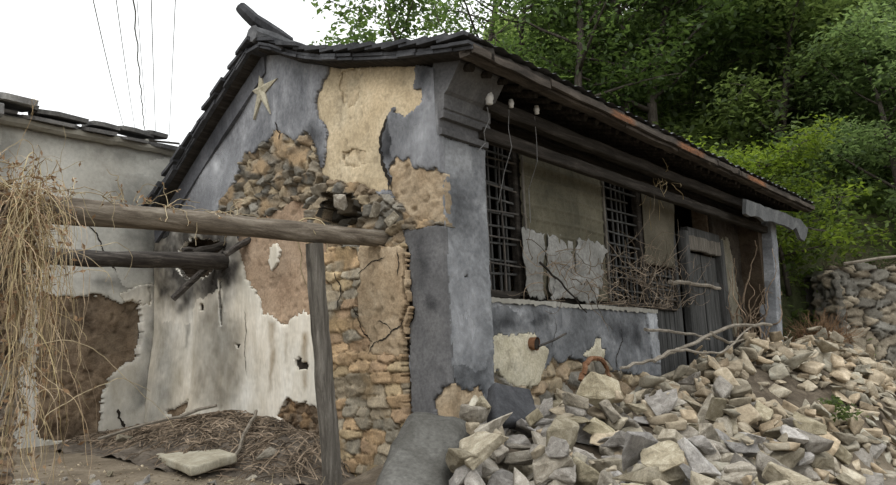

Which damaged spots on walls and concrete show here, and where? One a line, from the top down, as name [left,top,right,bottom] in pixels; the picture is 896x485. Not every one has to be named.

peeling [261,66,452,227]
peeling [238,236,310,325]
peeling [36,293,140,442]
spalling [278,398,320,436]
crack [334,248,415,414]
spalling [435,383,483,418]
peeling [493,332,549,388]